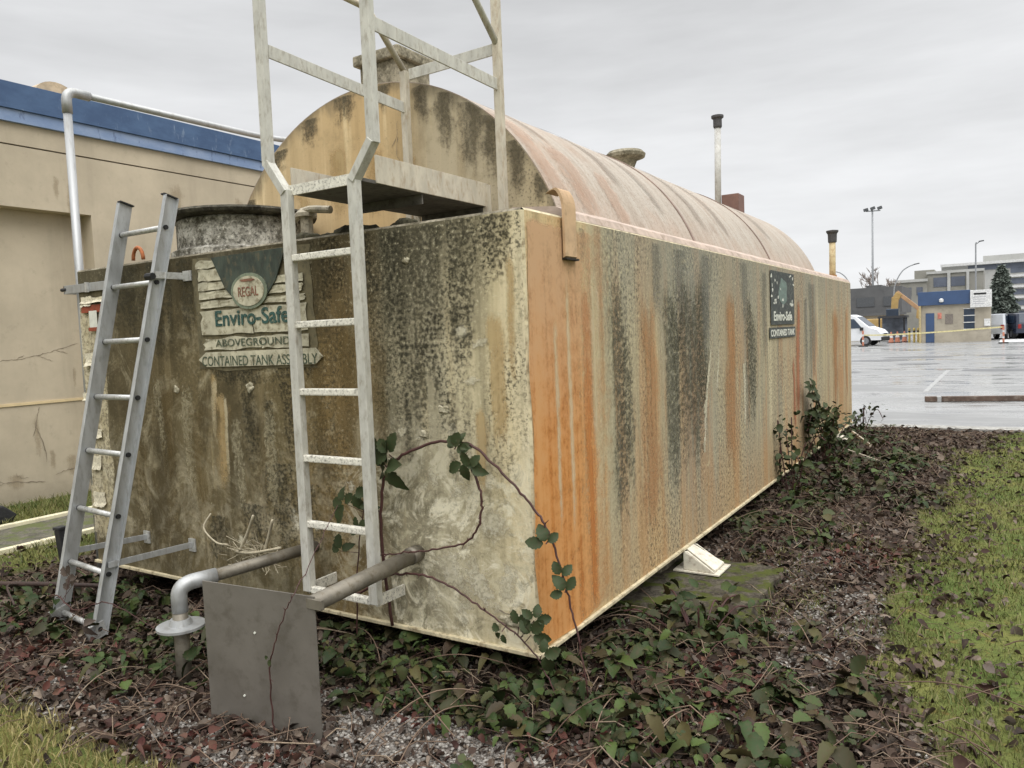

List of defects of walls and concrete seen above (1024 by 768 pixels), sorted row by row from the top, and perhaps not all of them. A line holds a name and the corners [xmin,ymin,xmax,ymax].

crack [1,407,73,485]
crack [3,343,77,361]
water stain [117,264,151,333]
water stain [156,259,194,348]
water stain [214,368,294,453]
water stain [320,238,342,295]
water stain [364,213,509,450]
rust [526,220,609,645]
water stain [612,287,636,514]
water stain [663,278,709,485]
water stain [746,303,758,418]
water stain [242,464,298,548]